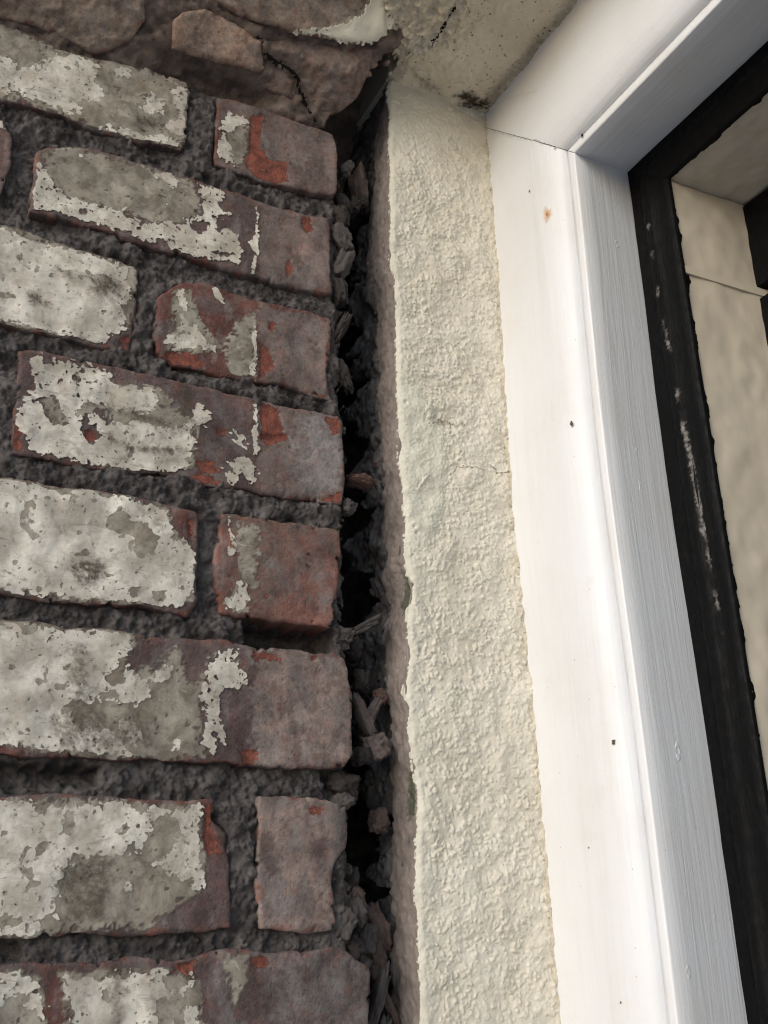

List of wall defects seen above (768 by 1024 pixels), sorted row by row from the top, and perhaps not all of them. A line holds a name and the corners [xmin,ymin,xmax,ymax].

peeling [0,24,189,148]
crack [256,35,317,123]
damp [454,93,487,110]
peeling [32,147,260,274]
peeling [0,226,138,350]
peeling [163,287,277,381]
peeling [13,353,288,486]
peeling [0,478,196,608]
crack [323,160,401,1024]
peeling [0,620,281,761]
peeling [0,796,222,939]
peeling [0,960,205,1024]